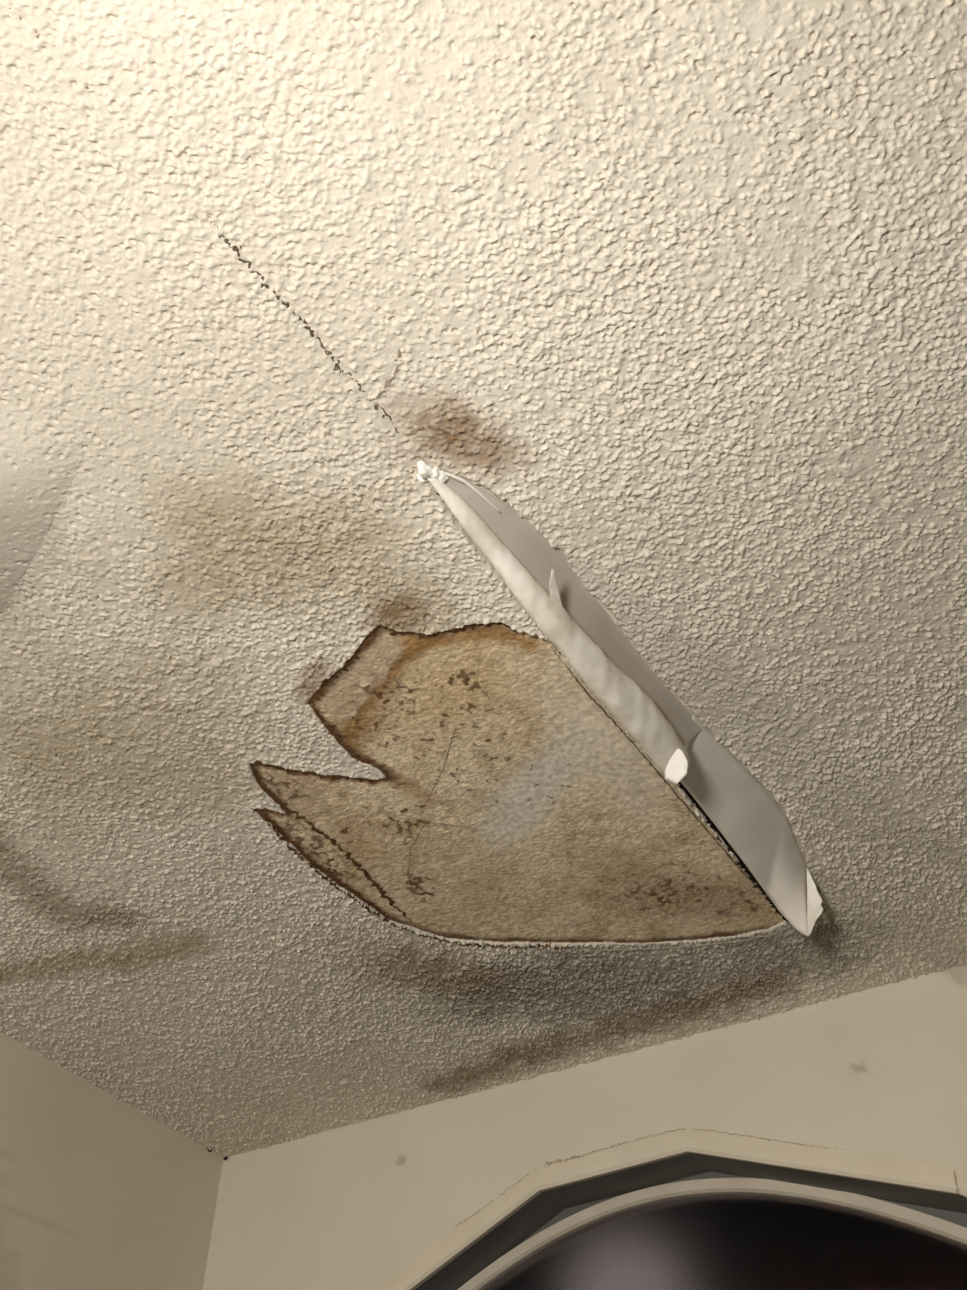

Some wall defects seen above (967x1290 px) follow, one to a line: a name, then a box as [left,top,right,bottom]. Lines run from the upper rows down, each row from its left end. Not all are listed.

peeling [549,569,572,619]
peeling [250,622,785,951]